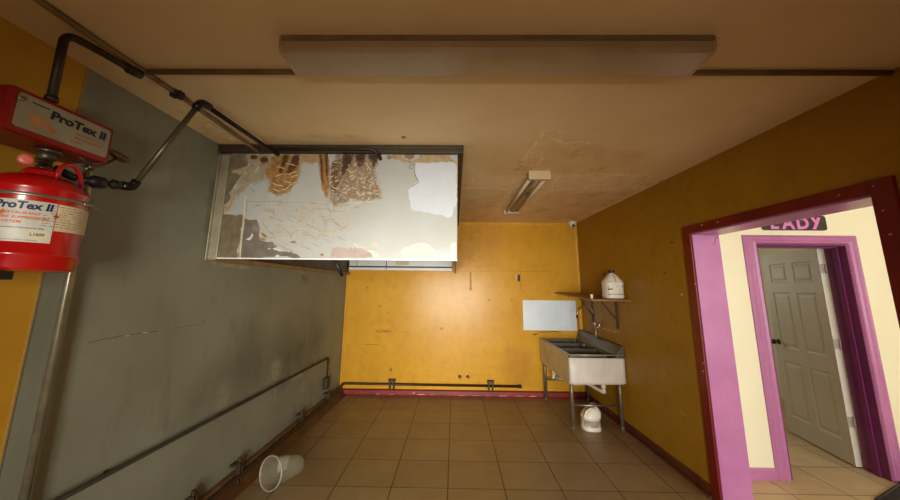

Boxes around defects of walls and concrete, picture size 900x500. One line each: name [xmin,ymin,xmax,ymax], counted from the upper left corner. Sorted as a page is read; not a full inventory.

crack [246,162,378,252]
peeling [387,155,457,218]